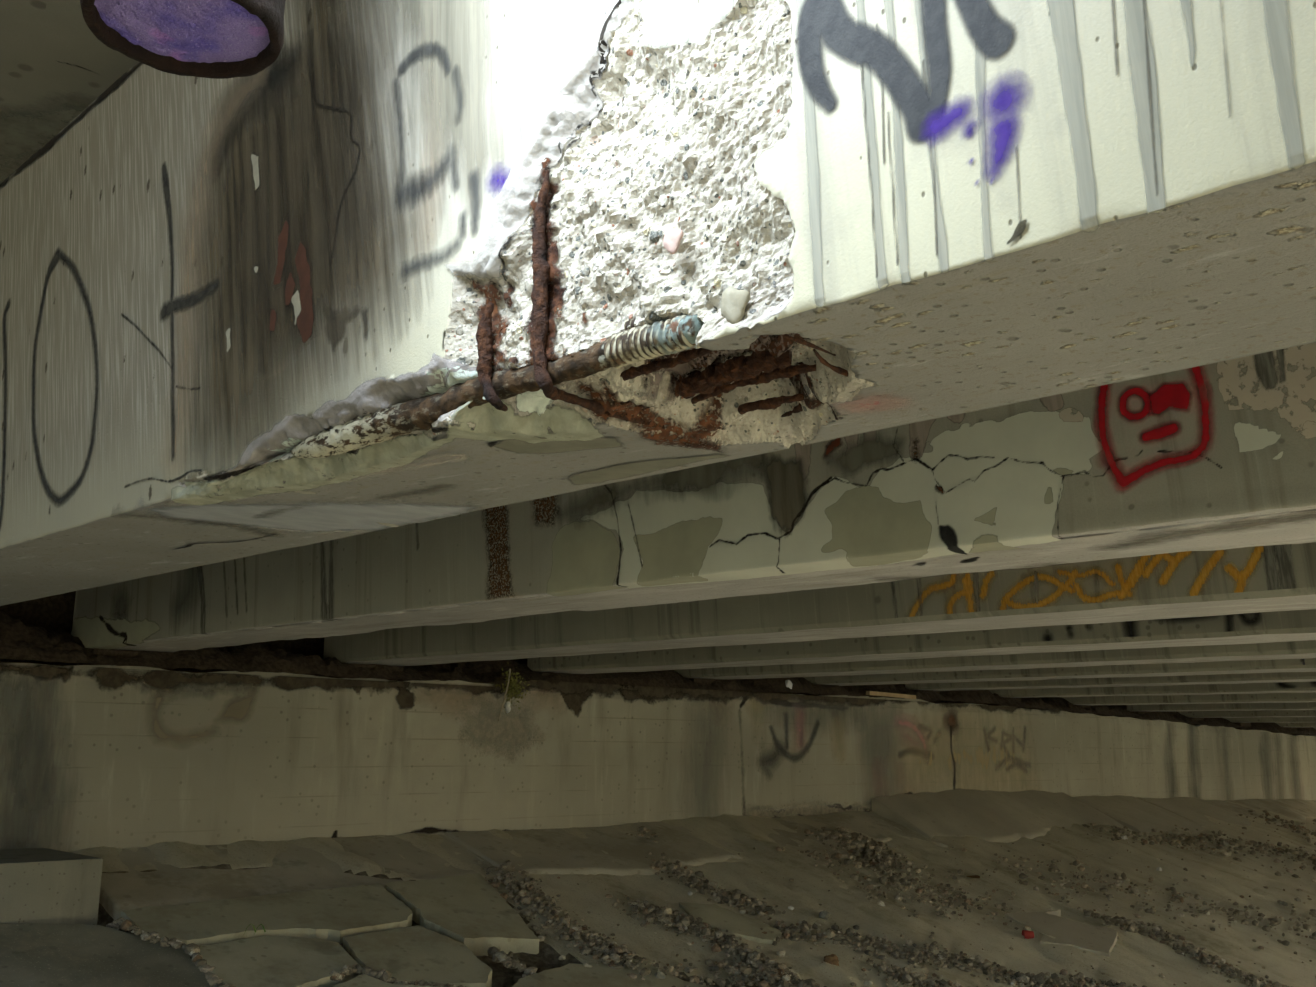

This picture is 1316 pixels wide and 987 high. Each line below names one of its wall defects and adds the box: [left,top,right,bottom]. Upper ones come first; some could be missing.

crack [545,0,622,171]
corrosion [471,157,574,372]
spalling [171,0,876,506]
crack [498,204,557,280]
water stain [422,366,478,397]
water stain [516,385,555,416]
corrosion [578,333,848,452]
peeling [909,413,965,459]
peeling [1040,394,1083,422]
peeling [1217,343,1316,460]
corrosion [485,505,513,599]
crack [710,431,1171,573]